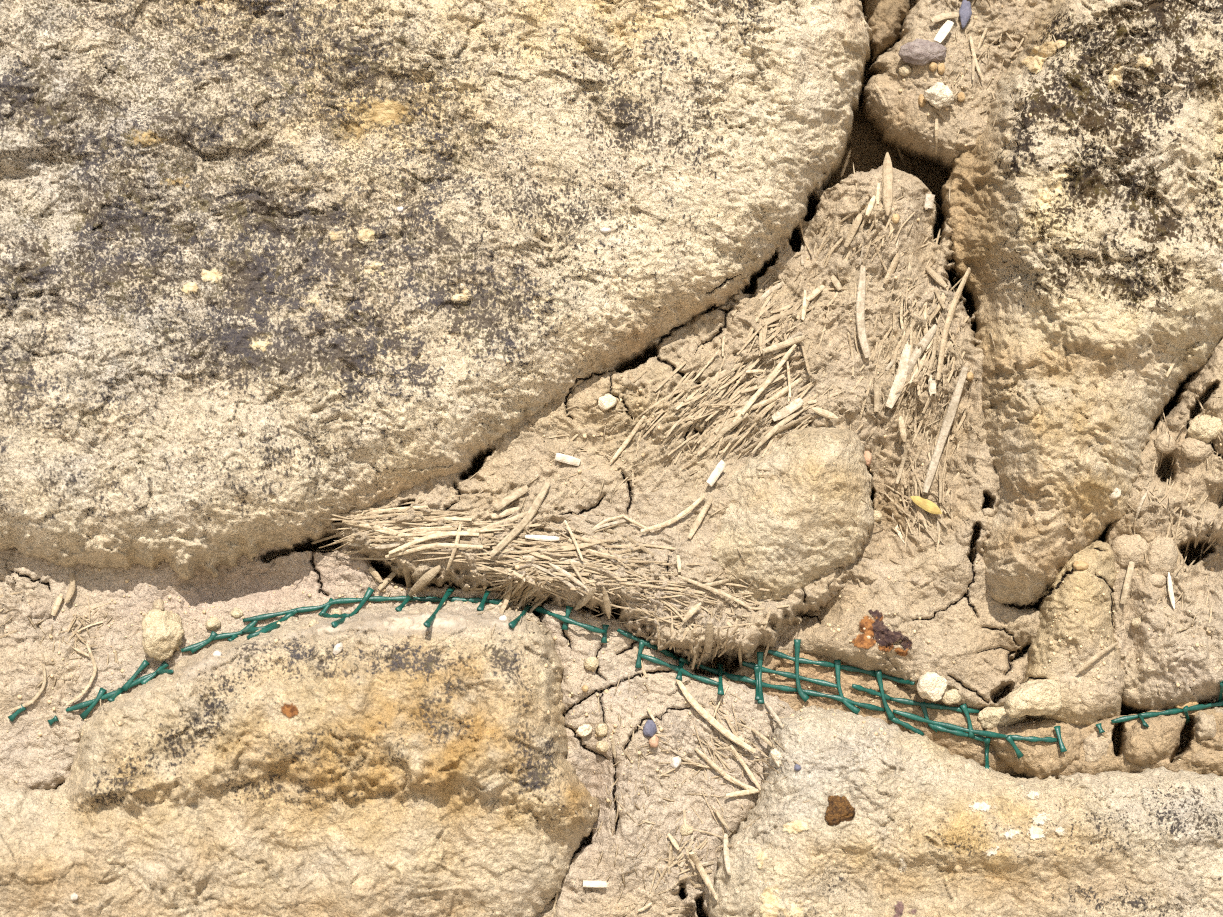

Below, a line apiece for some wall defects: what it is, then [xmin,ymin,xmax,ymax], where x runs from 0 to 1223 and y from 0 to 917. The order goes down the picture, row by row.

crack [564,371,633,419]
crack [655,274,741,441]
crack [12,571,51,591]
crack [915,547,1113,703]
crack [562,629,689,832]